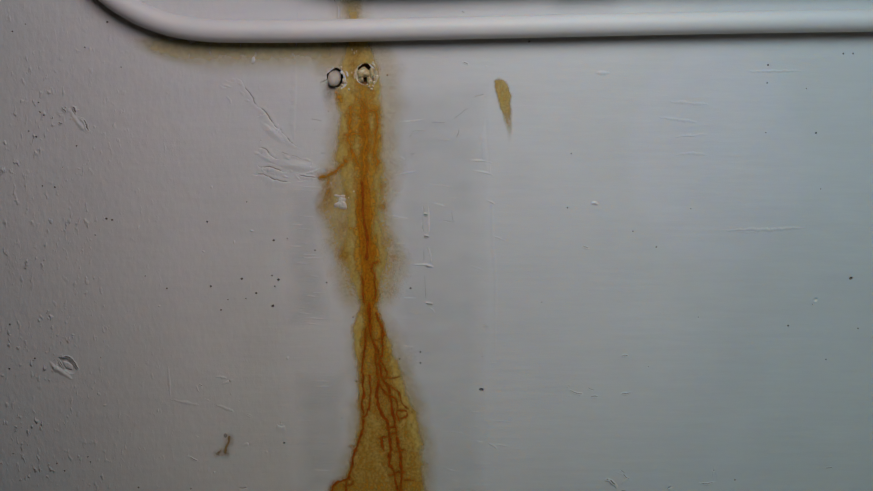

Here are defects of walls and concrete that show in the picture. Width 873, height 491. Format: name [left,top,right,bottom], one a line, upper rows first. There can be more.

rust [319,42,425,491]
rust [495,80,511,124]